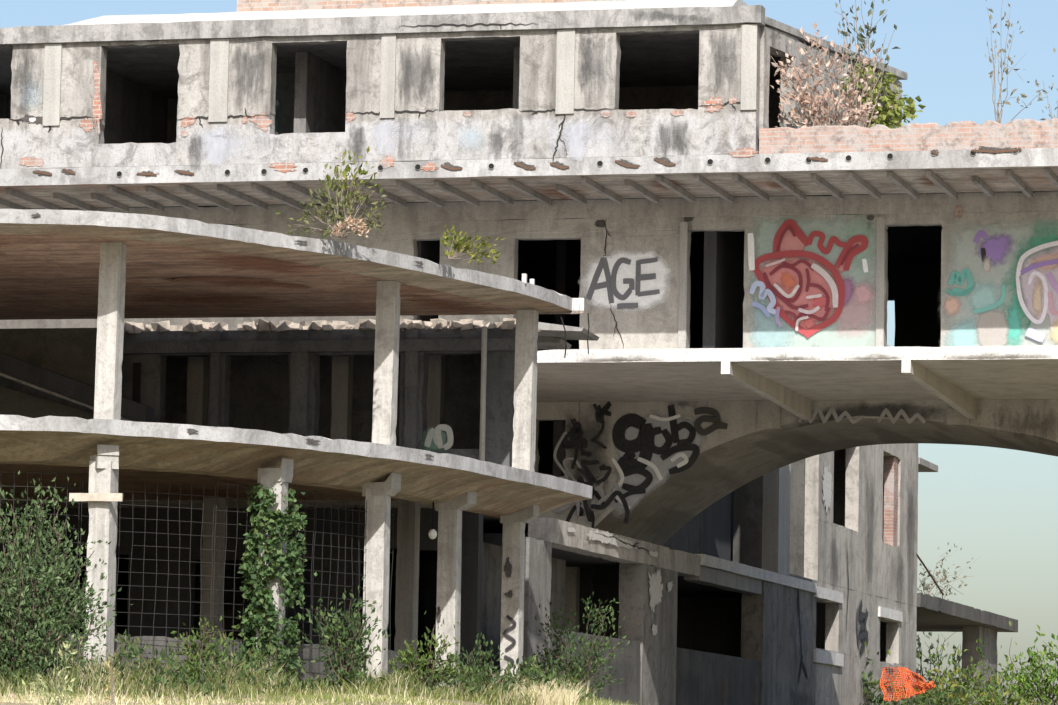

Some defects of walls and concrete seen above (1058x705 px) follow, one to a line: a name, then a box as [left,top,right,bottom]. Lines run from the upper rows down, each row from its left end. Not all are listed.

crack [0,119,21,168]
spalling [15,114,43,125]
crack [48,116,96,133]
flaking render [79,60,102,133]
crack [519,108,612,162]
peeling [567,527,674,635]